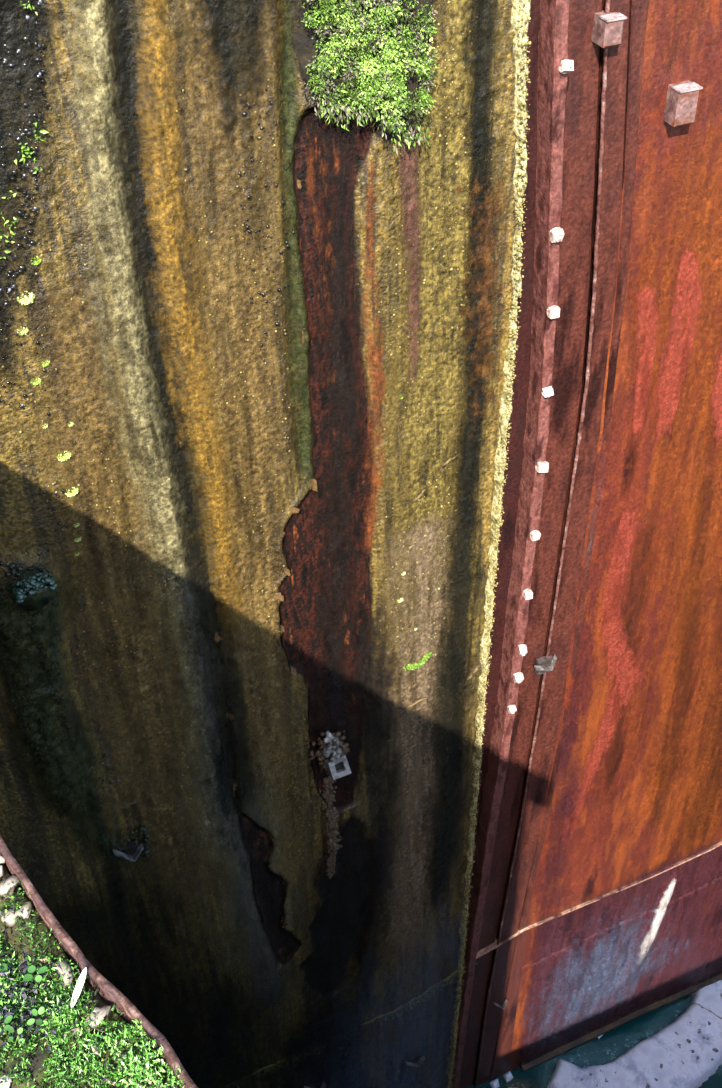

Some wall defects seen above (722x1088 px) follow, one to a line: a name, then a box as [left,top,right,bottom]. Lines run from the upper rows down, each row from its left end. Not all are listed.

water stain [0,0,53,362]
peeling [237,807,302,965]
water stain [48,0,497,1088]
peeling [275,99,375,812]